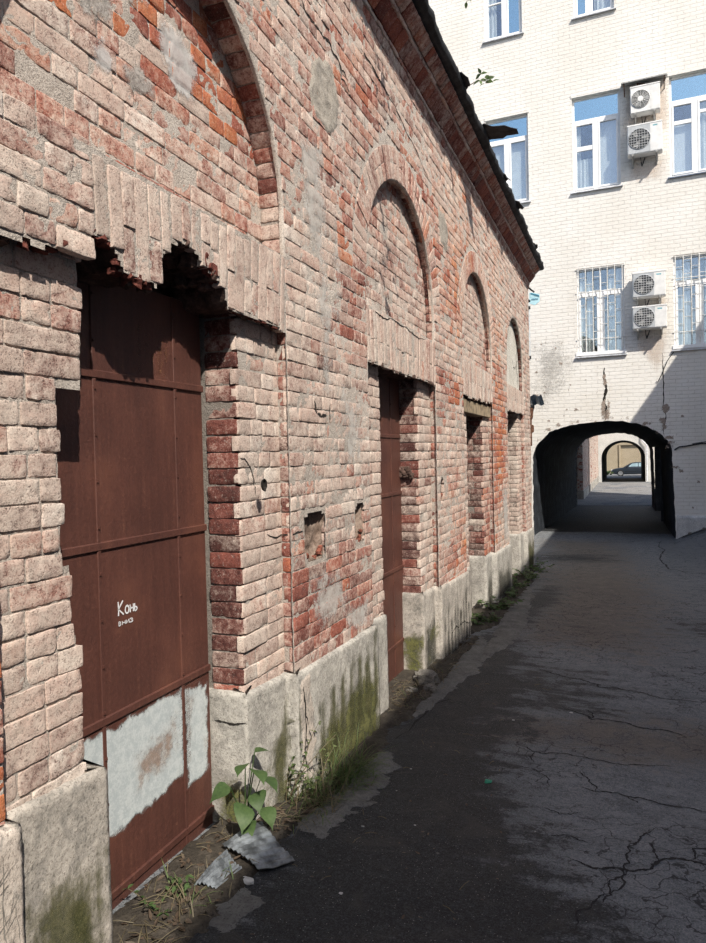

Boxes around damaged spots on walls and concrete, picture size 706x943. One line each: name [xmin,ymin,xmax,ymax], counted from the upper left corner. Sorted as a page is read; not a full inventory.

peeling [0,235,68,255]
peeling [91,229,153,294]
peeling [162,240,218,292]
crack [601,368,610,419]
crack [659,354,670,437]
crack [538,668,705,702]
crack [566,709,685,737]
peeling [84,684,208,836]
crack [517,744,705,812]
crack [0,857,8,943]
peeling [0,817,25,943]
crack [546,808,706,930]